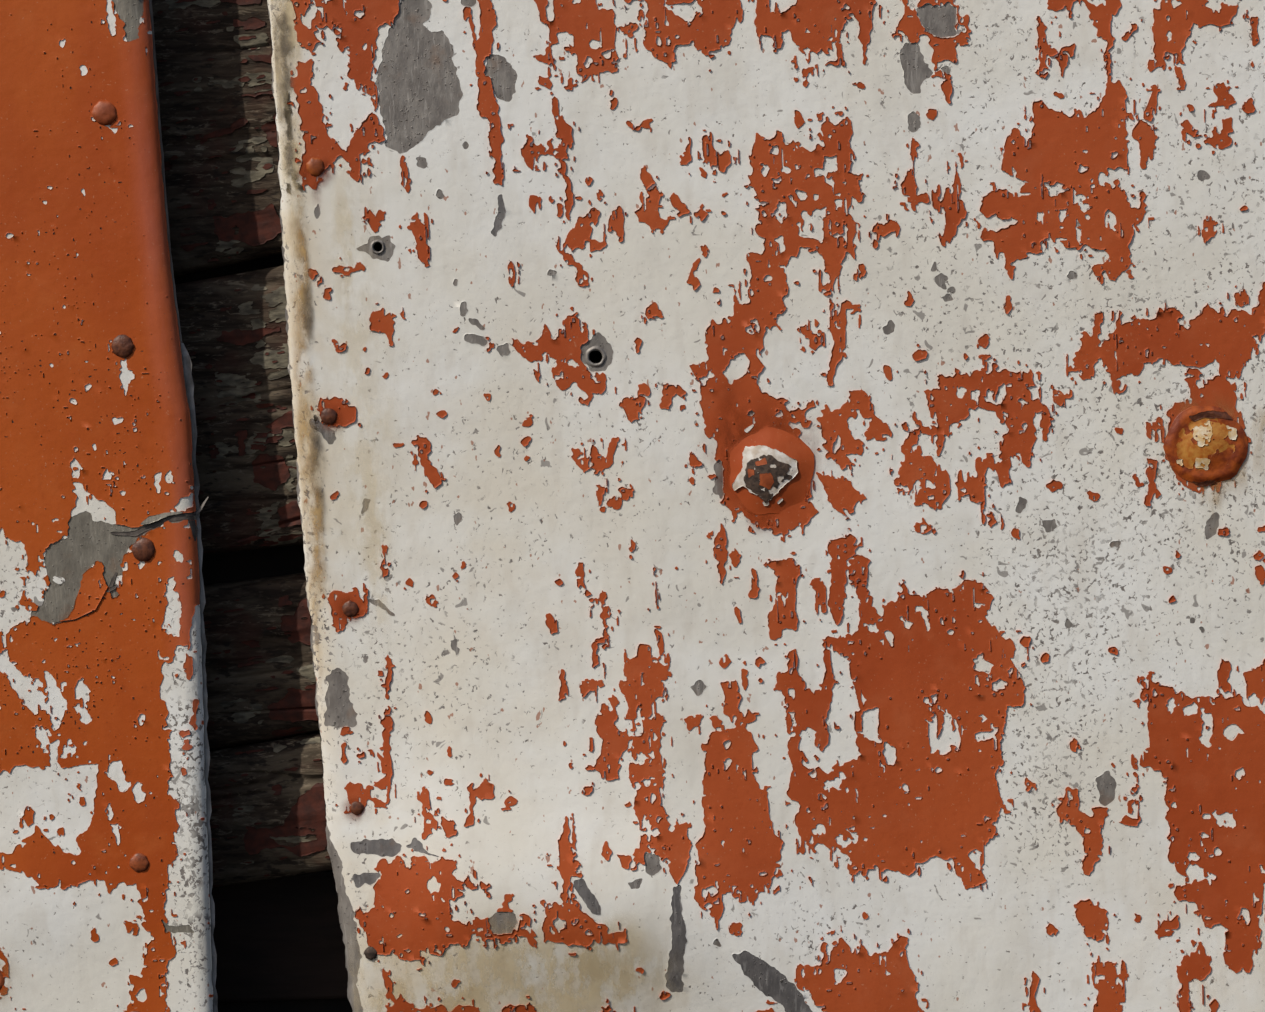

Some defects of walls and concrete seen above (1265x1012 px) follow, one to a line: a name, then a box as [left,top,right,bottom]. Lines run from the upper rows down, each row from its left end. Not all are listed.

leakage [276,1,295,96]
peeling [161,107,286,262]
rust [748,458,774,489]
peeling [287,0,1265,947]
rust [1176,417,1235,473]
crack [111,497,208,541]
crack [54,572,117,624]
peeling [0,284,627,1012]
peeling [1051,659,1265,1012]
peeling [794,929,929,1012]
peeling [1022,971,1045,1012]